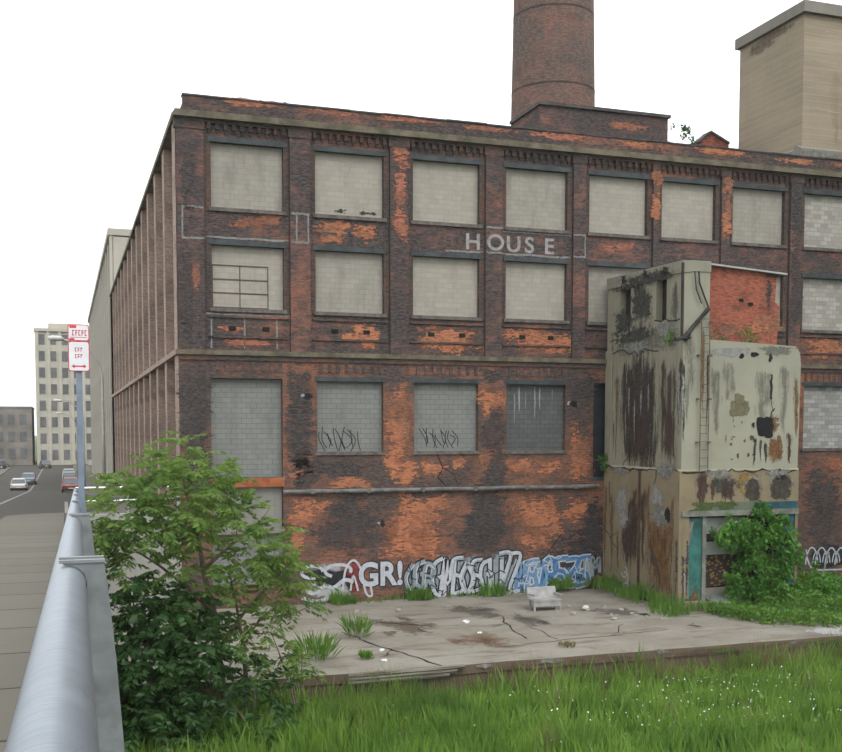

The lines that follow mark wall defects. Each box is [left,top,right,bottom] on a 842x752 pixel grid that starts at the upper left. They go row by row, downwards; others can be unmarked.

spalling [227,214,283,230]
spalling [311,220,378,244]
spalling [390,147,411,243]
leakage [610,266,676,468]
spalling [474,386,507,417]
spalling [377,382,467,563]
spalling [507,420,596,483]
spalling [286,476,374,554]
spalling [507,494,593,554]
crack [341,617,443,666]
crack [494,613,668,647]